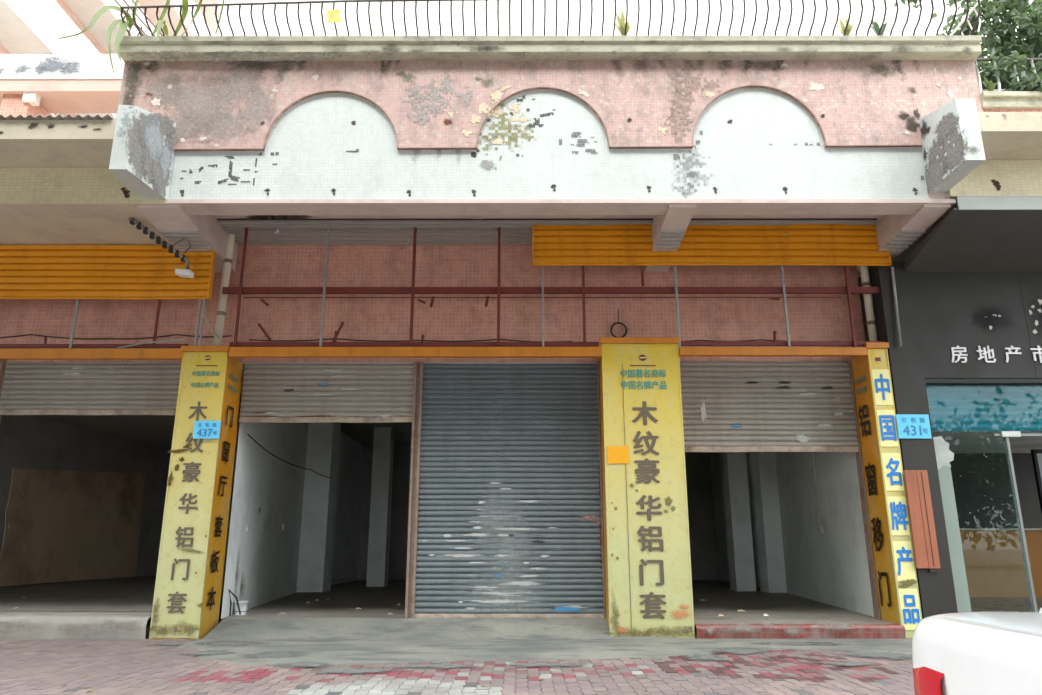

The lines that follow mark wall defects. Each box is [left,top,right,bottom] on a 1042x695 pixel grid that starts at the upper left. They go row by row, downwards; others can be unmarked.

peeling [401,75,556,137]
peeling [122,97,279,199]
peeling [471,138,506,170]